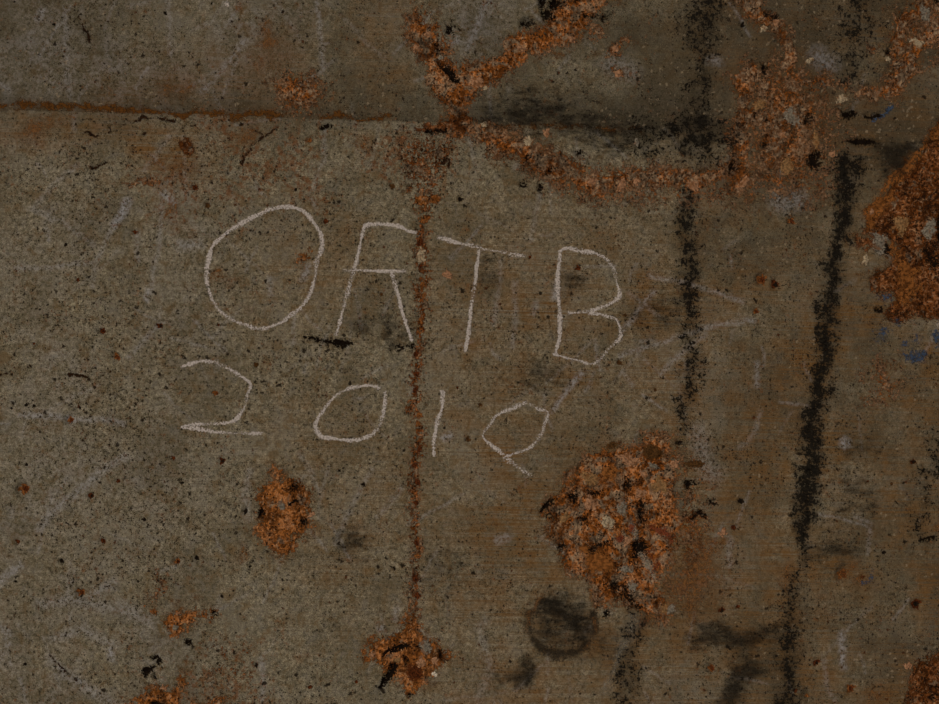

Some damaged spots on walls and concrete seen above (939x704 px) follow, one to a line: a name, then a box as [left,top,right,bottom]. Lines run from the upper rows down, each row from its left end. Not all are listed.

damp [485,0,744,179]
damp [651,183,709,435]
damp [691,131,932,704]
corrosion [252,459,321,563]
corrosion [117,643,258,704]
corrosion [357,609,456,700]
damp [493,591,650,704]